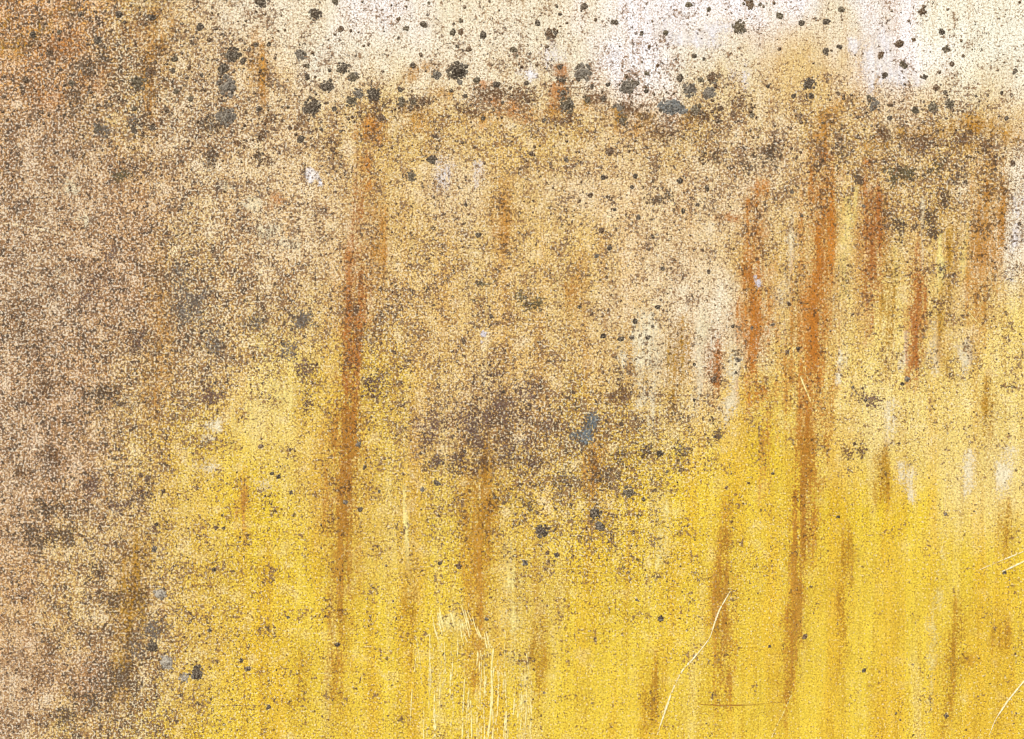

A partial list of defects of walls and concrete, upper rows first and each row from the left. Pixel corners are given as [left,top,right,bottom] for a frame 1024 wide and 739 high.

mould [199,106,231,172]
mould [234,108,280,168]
mould [345,94,437,123]
water stain [453,83,538,123]
mould [542,86,650,127]
mould [646,91,753,146]
rust [859,113,1021,385]
rust [324,246,371,638]
mould [403,362,657,489]
mould [671,441,693,459]
rust [716,171,836,703]